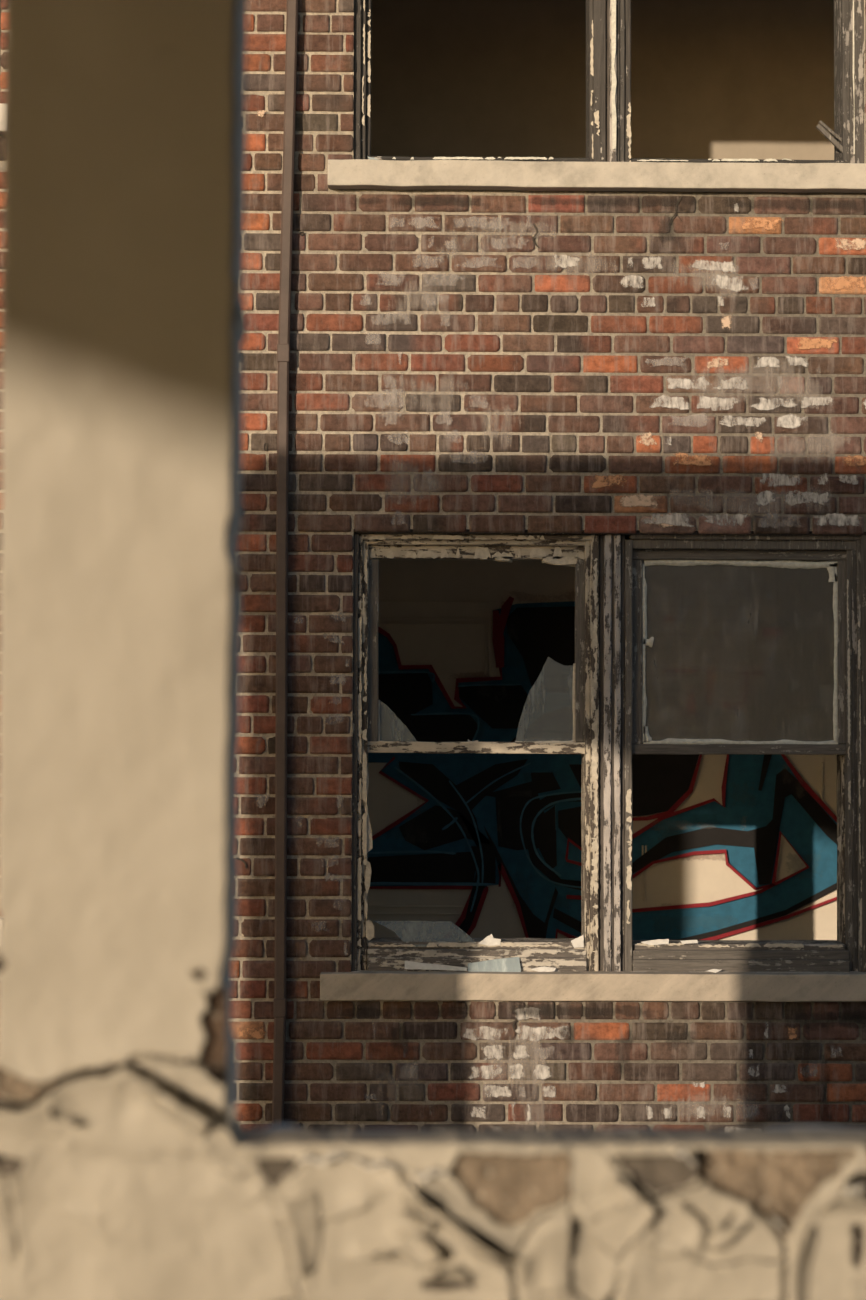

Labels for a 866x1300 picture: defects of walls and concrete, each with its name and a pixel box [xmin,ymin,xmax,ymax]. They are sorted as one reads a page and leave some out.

peeling [590,0,688,162]
leakage [555,255,595,272]
leakage [621,257,662,306]
leakage [692,261,744,306]
leakage [652,356,832,428]
leakage [645,473,858,527]
peeling [357,535,632,958]
peeling [847,579,861,864]
peeling [637,939,843,948]
crack [0,1055,231,1122]
leakage [463,1007,567,1121]
crack [633,1180,788,1300]